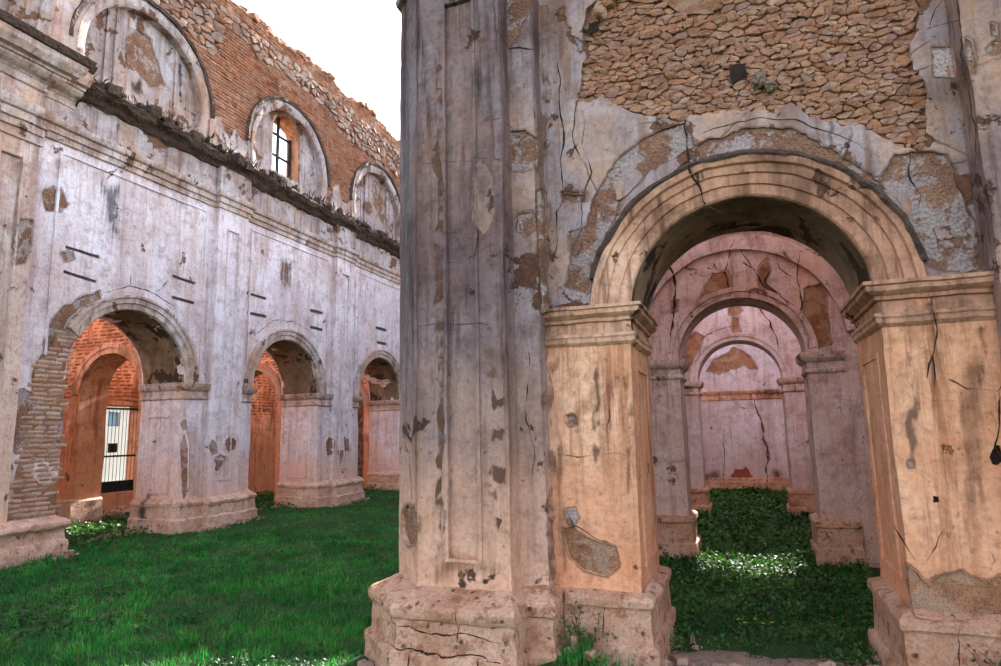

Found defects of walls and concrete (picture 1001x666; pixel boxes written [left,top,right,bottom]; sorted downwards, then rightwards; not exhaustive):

spalling [125,29,165,87]
water stain [432,64,453,304]
crack [552,65,592,262]
spalling [560,123,982,293]
flaking render [7,290,107,519]
water stain [435,319,451,506]
spalling [706,306,758,375]
crack [754,399,771,487]
crack [927,298,1001,456]
spalling [401,504,420,547]
spalling [563,507,620,577]